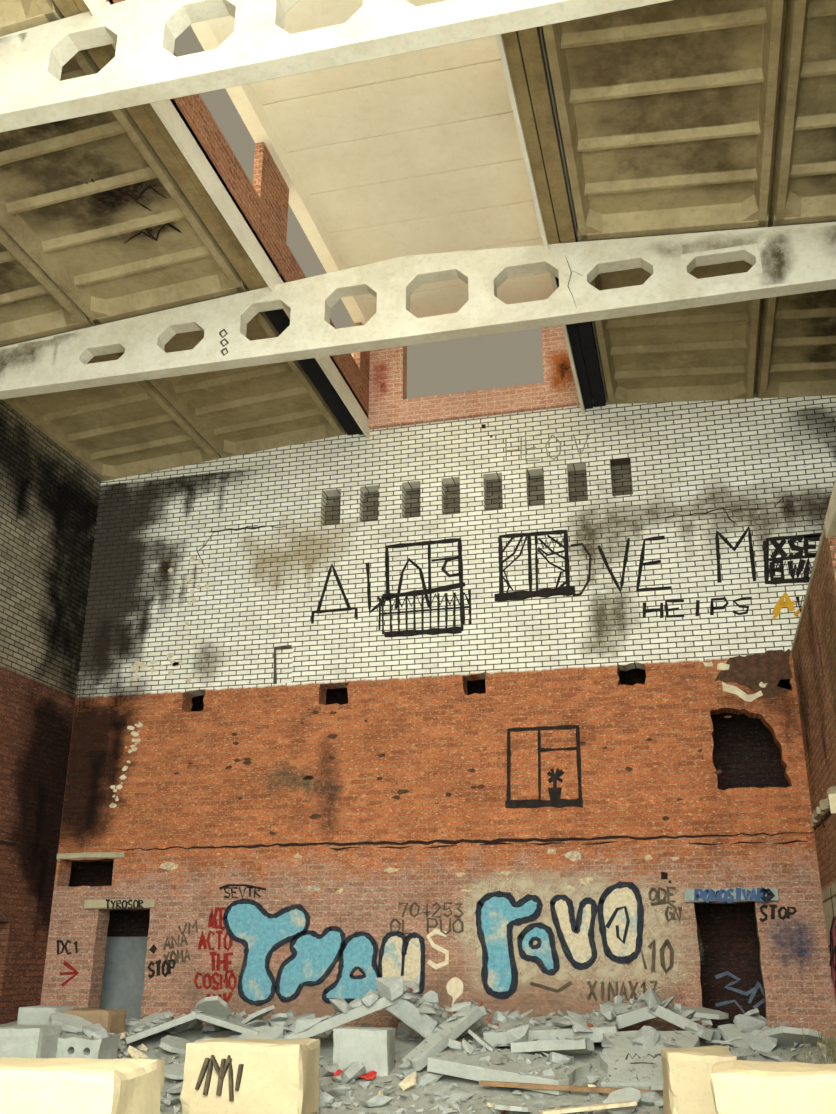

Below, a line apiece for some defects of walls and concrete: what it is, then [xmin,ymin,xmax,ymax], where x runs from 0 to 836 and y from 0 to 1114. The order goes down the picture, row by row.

water stain [808,412,836,434]
water stain [575,511,640,556]
water stain [702,492,831,541]
water stain [13,476,214,926]
spalling [703,649,793,718]
spalling [226,733,252,769]